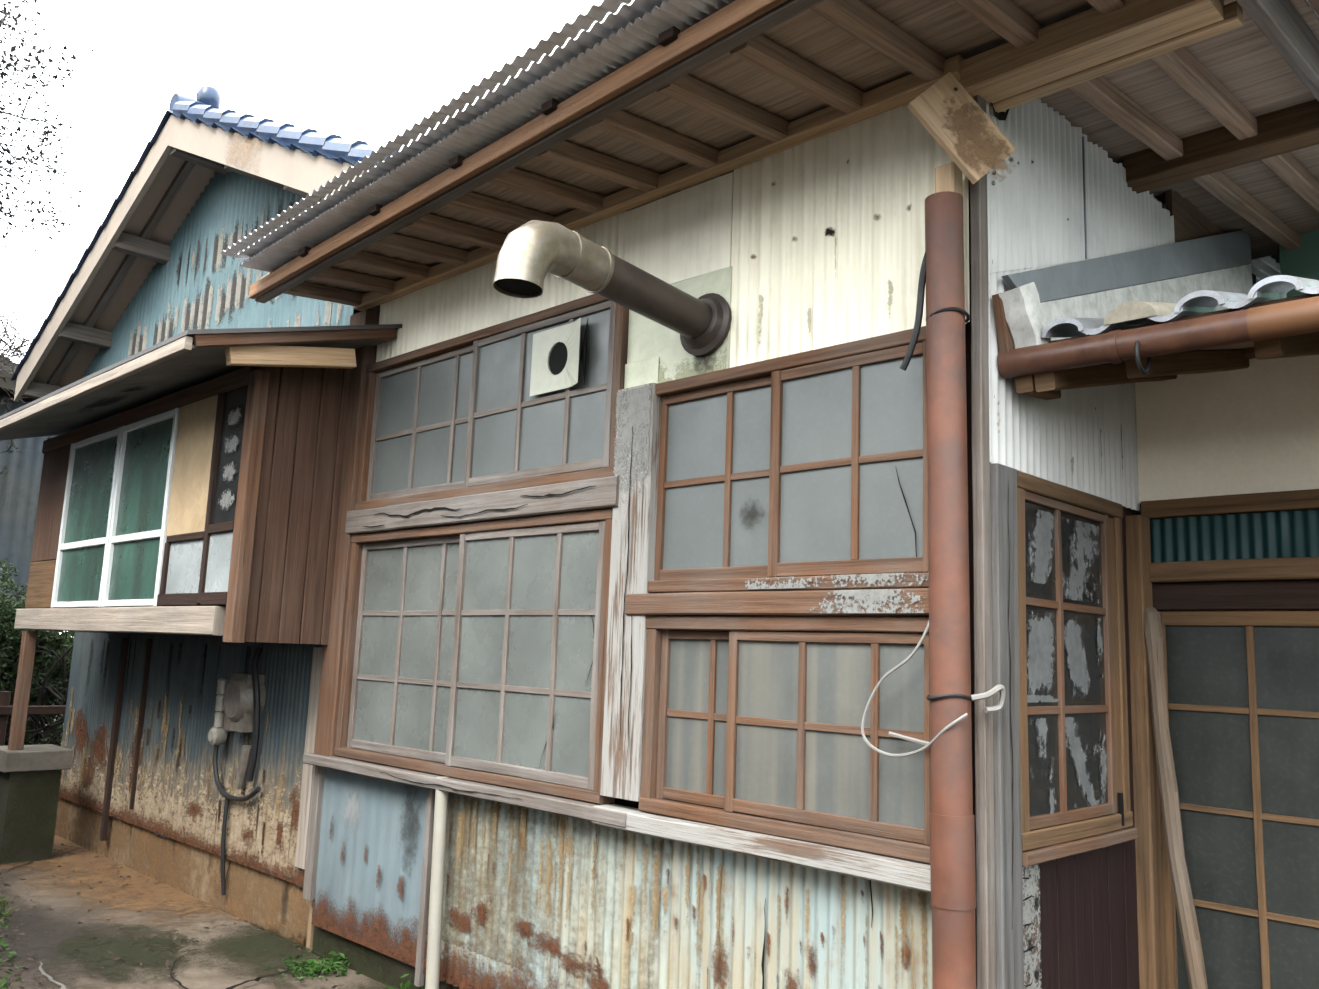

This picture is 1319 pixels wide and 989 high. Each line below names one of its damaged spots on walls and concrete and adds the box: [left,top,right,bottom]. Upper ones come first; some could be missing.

peeling [745,572,929,613]
corrosion [56,688,609,989]
corrosion [626,838,734,989]
corrosion [767,888,824,989]
corrosion [863,891,927,989]